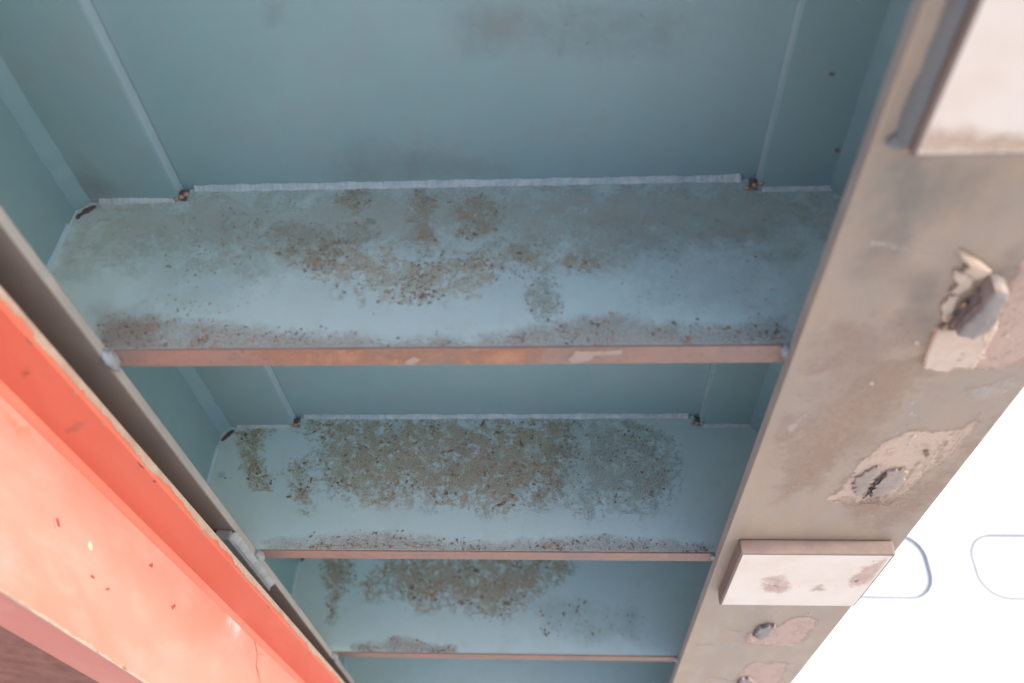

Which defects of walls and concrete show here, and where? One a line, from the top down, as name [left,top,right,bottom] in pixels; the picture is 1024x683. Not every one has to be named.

corrosion [96,188,626,366]
peeling [918,250,1024,372]
corrosion [236,418,678,515]
peeling [826,412,983,507]
corrosion [270,529,714,645]
peeling [745,613,821,647]